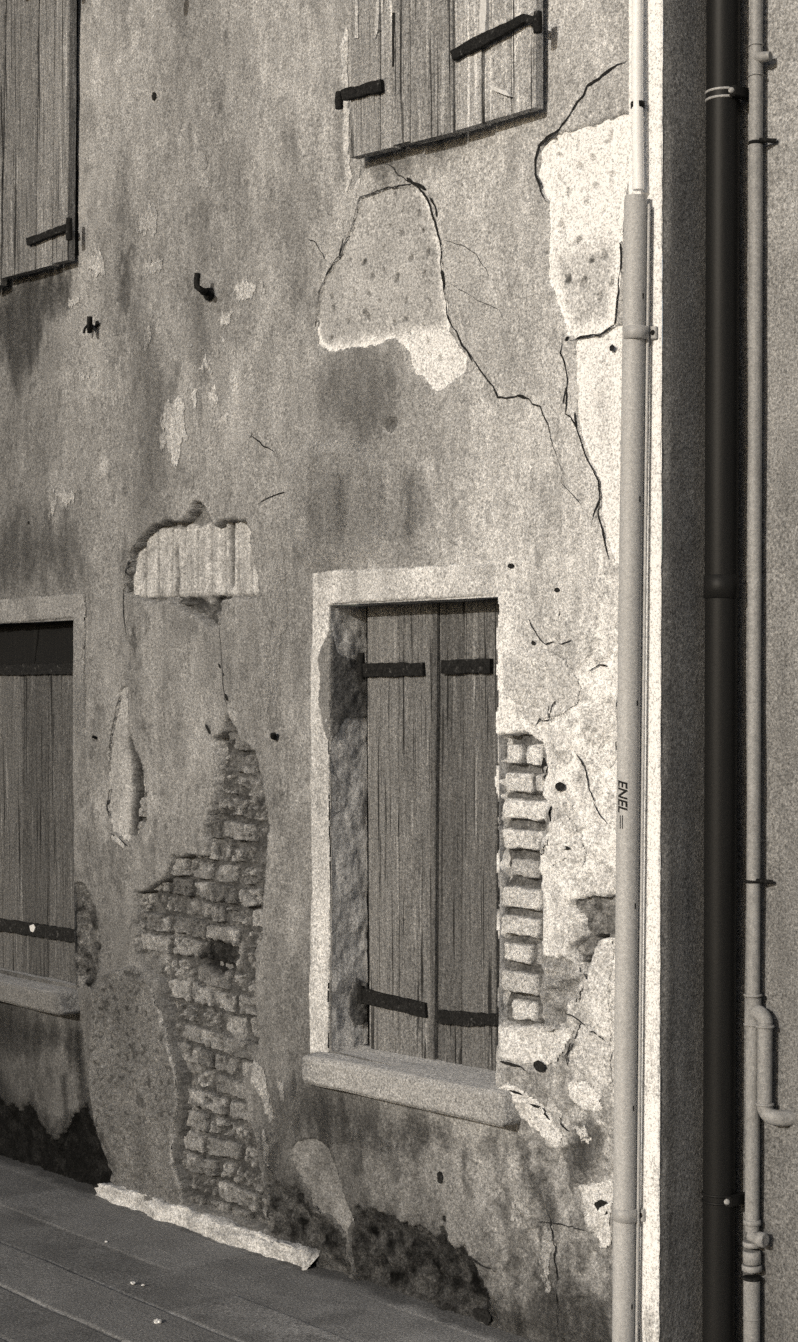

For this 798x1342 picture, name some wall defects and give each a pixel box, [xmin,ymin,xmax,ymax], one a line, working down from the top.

flaking render [317,0,467,391]
crack [309,157,622,558]
crack [534,60,627,202]
flaking render [539,114,629,563]
spalling [110,687,149,847]
flaking render [133,505,287,724]
spalling [139,731,493,1325]
spalling [499,641,617,1150]